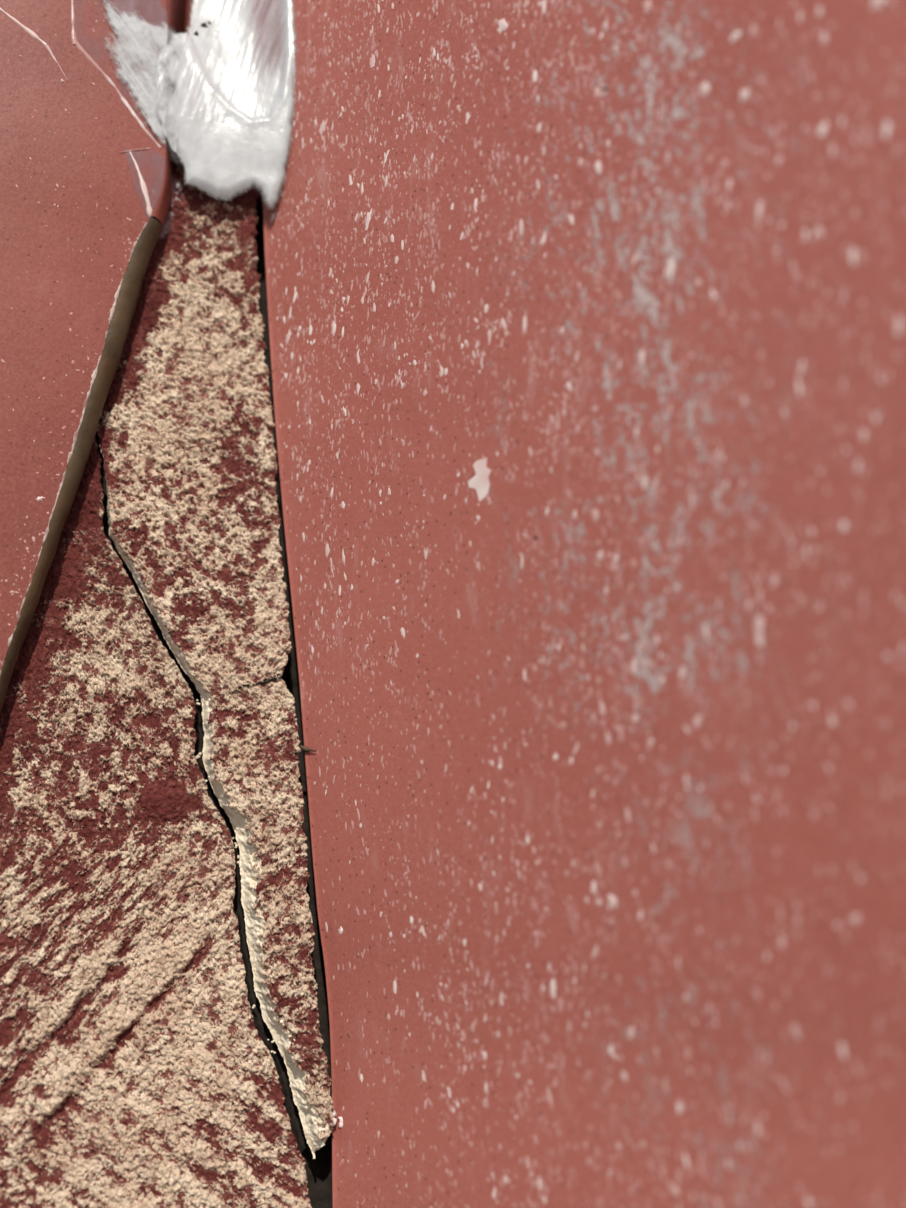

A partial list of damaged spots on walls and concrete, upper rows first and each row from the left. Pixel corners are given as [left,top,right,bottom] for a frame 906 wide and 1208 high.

peeling [0,155,334,1208]
crack [95,435,311,1153]